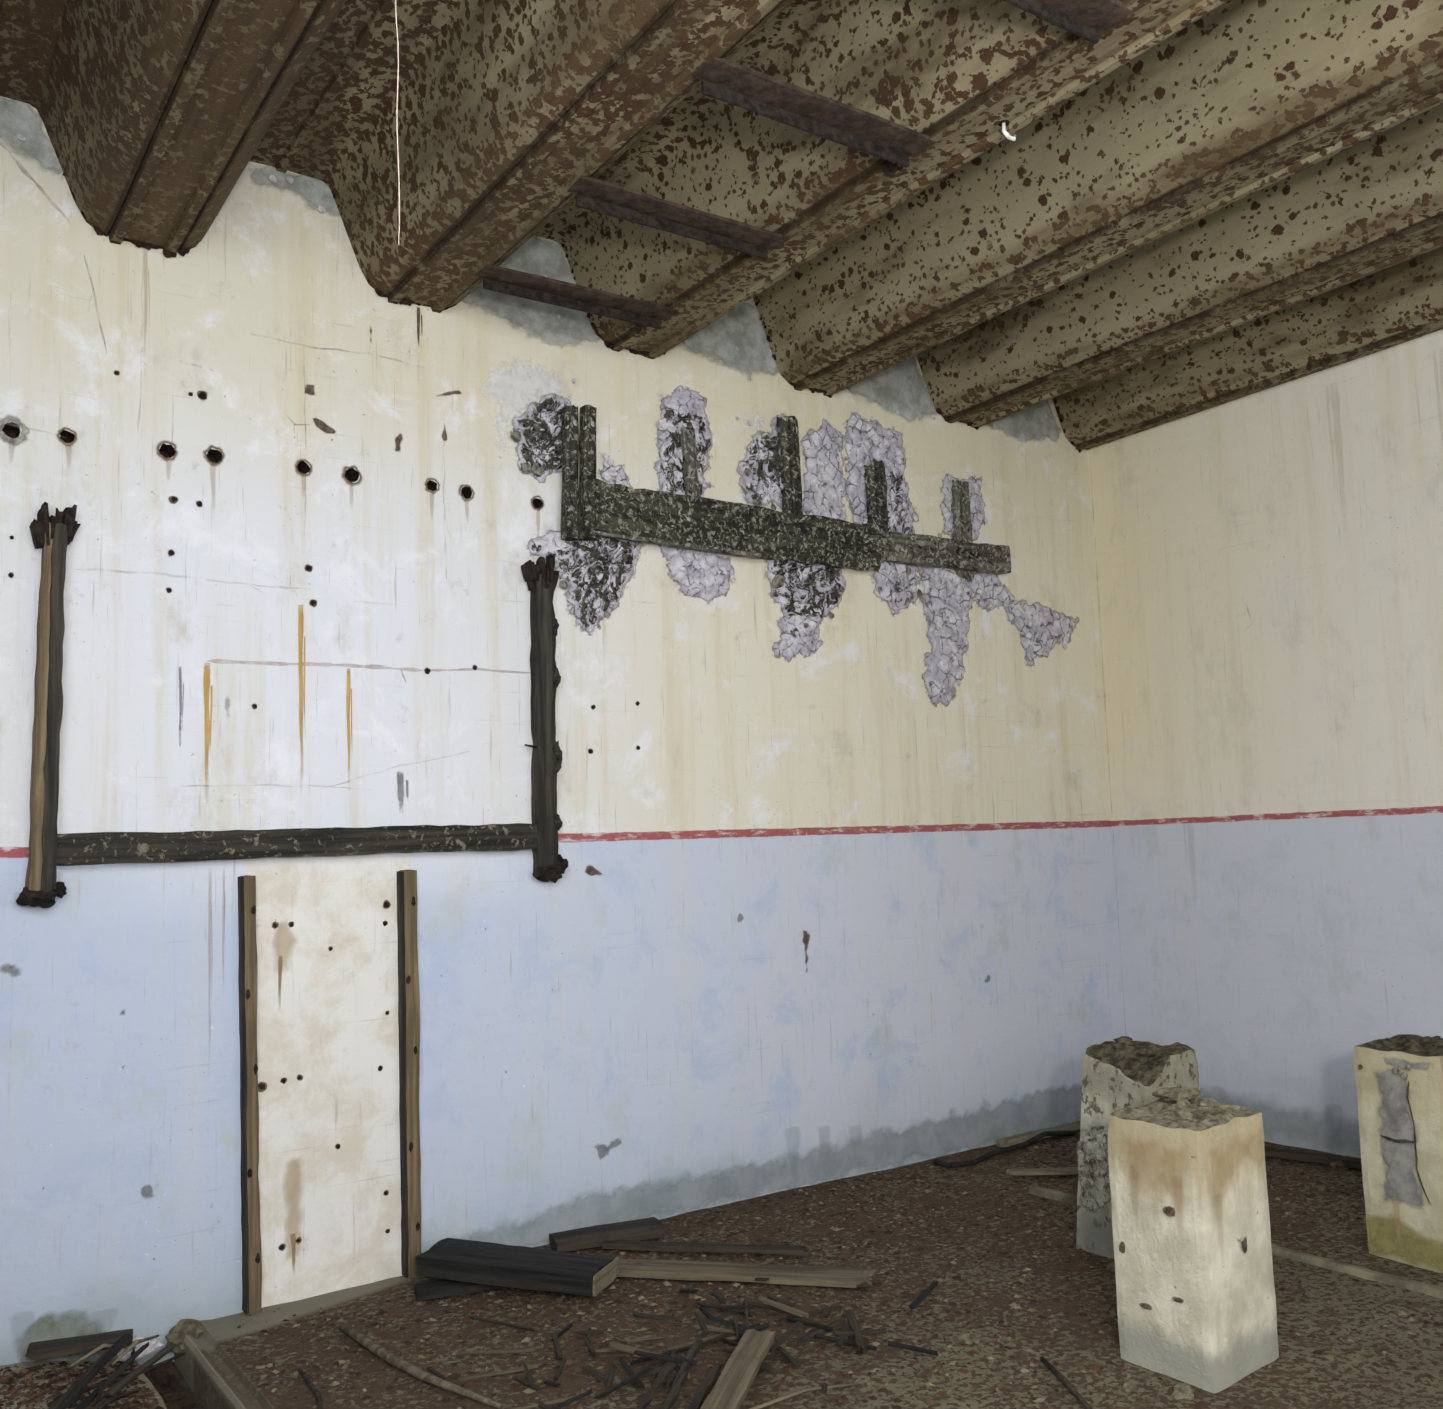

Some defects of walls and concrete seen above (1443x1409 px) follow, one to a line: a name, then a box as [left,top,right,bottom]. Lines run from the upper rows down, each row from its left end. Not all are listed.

corrosion [72,191,205,258]
corrosion [367,278,458,312]
corrosion [586,313,667,359]
corrosion [755,302,832,398]
peeling [653,385,713,497]
peeling [801,357,936,534]
spalling [531,496,544,510]
peeling [938,474,988,540]
peeling [658,544,736,601]
peeling [918,566,1080,707]
corrosion [204,665,213,773]
leakage [470,1087,1082,1246]